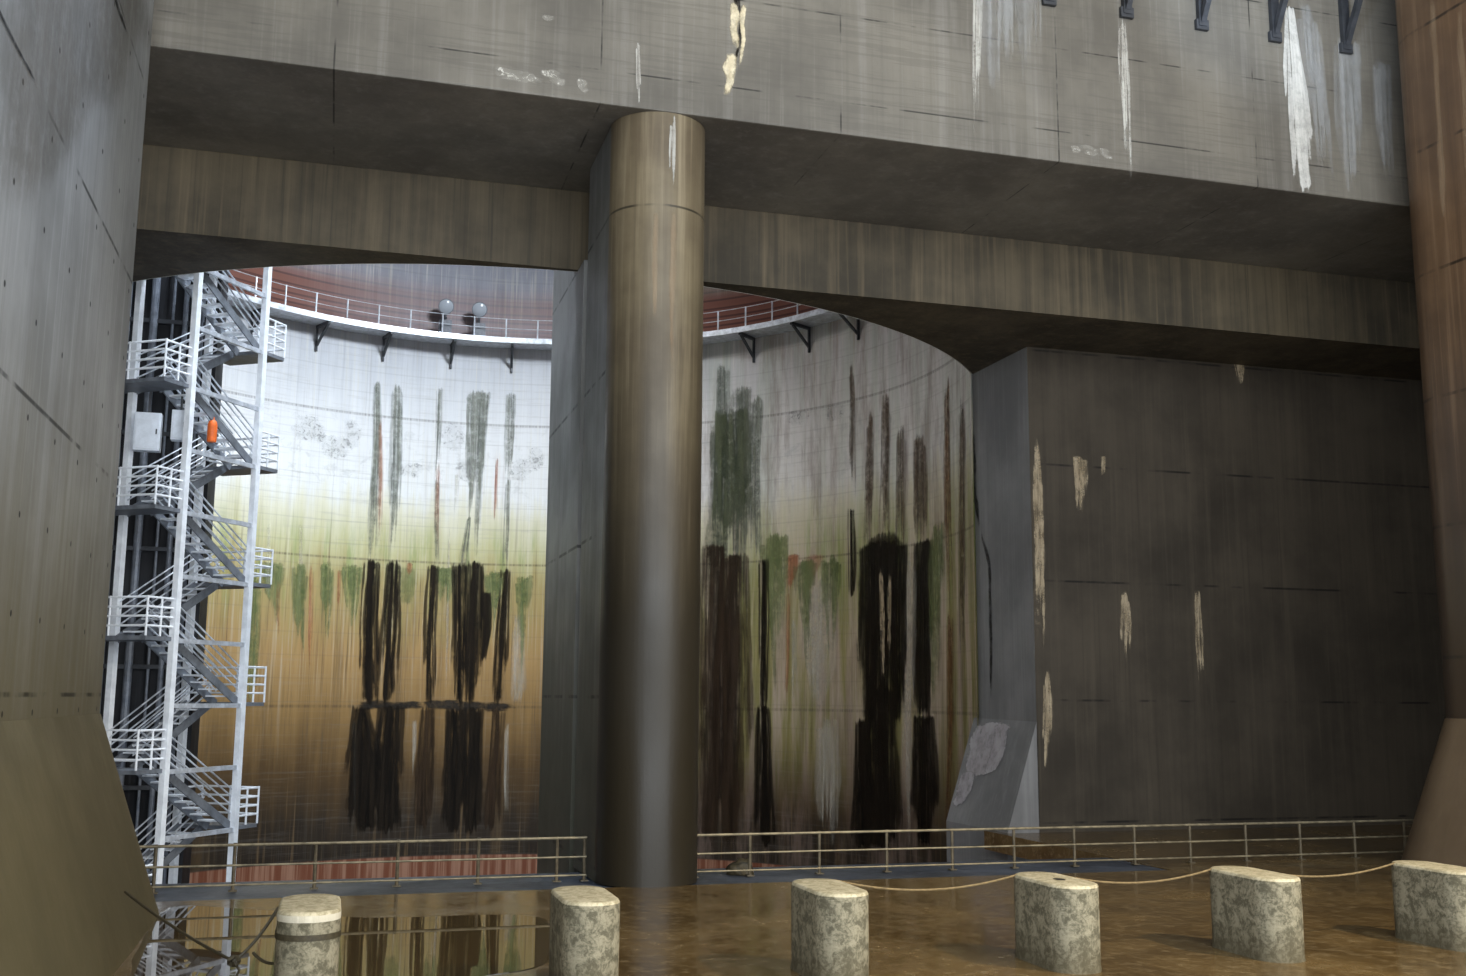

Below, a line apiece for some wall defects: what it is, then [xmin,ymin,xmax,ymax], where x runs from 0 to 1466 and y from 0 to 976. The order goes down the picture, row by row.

efflorescence [1283,6,1313,192]
damp [345,560,511,832]
damp [754,560,775,847]
damp [848,510,1010,849]